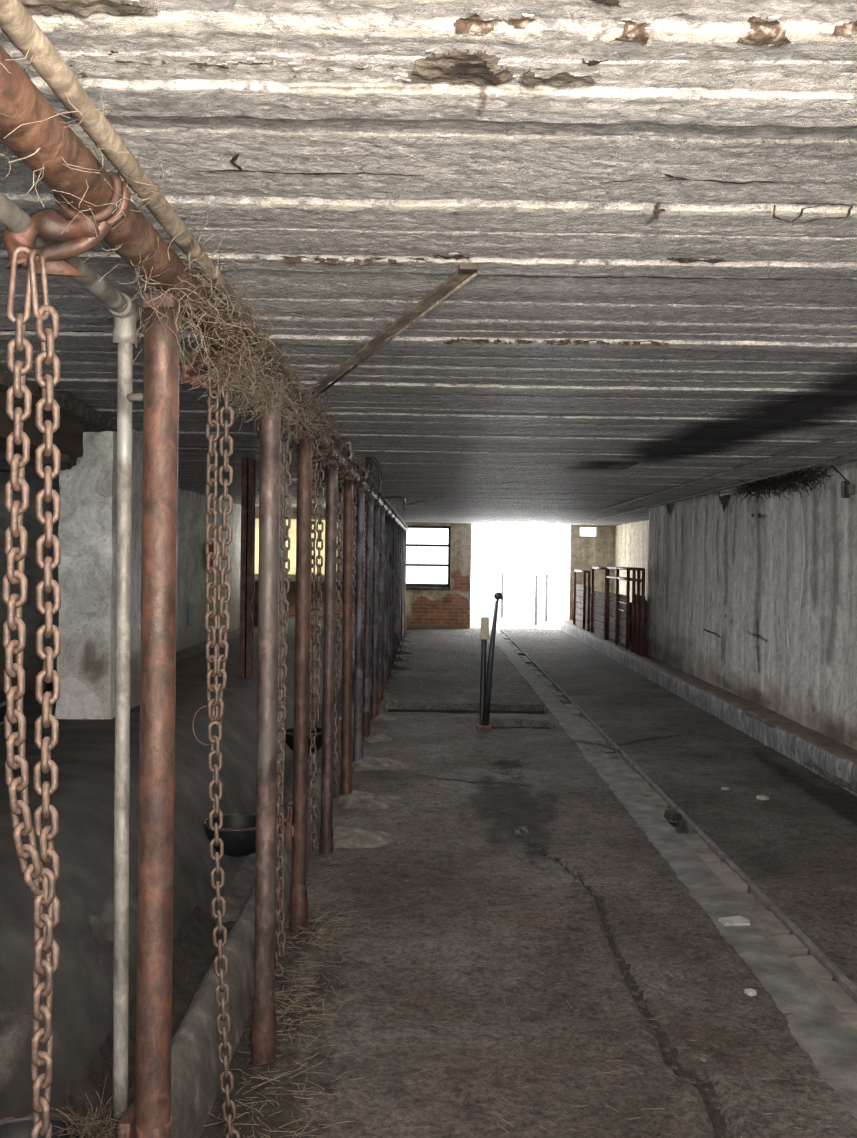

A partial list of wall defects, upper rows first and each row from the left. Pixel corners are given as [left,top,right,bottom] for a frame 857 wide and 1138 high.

spalling [19,0,158,19]
peeling [454,13,538,36]
peeling [590,0,651,46]
peeling [737,15,791,48]
peeling [833,21,857,38]
spalling [394,47,608,88]
crack [608,174,854,223]
spalling [410,570,471,627]
crack [416,774,737,1138]